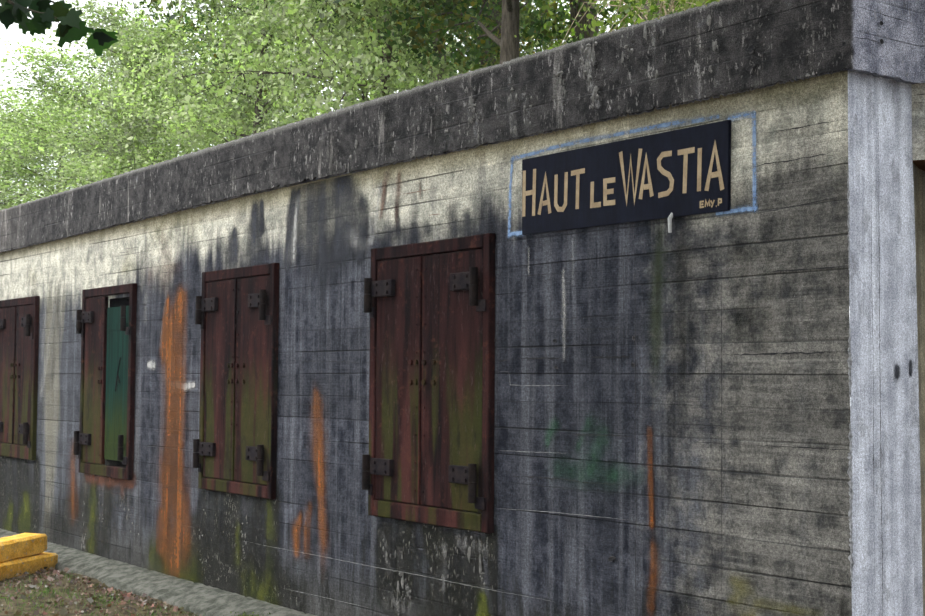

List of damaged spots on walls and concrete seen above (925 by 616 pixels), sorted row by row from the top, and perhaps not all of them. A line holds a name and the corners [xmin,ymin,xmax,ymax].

corrosion [158,289,187,573]
corrosion [293,392,324,556]
corrosion [648,544,657,611]